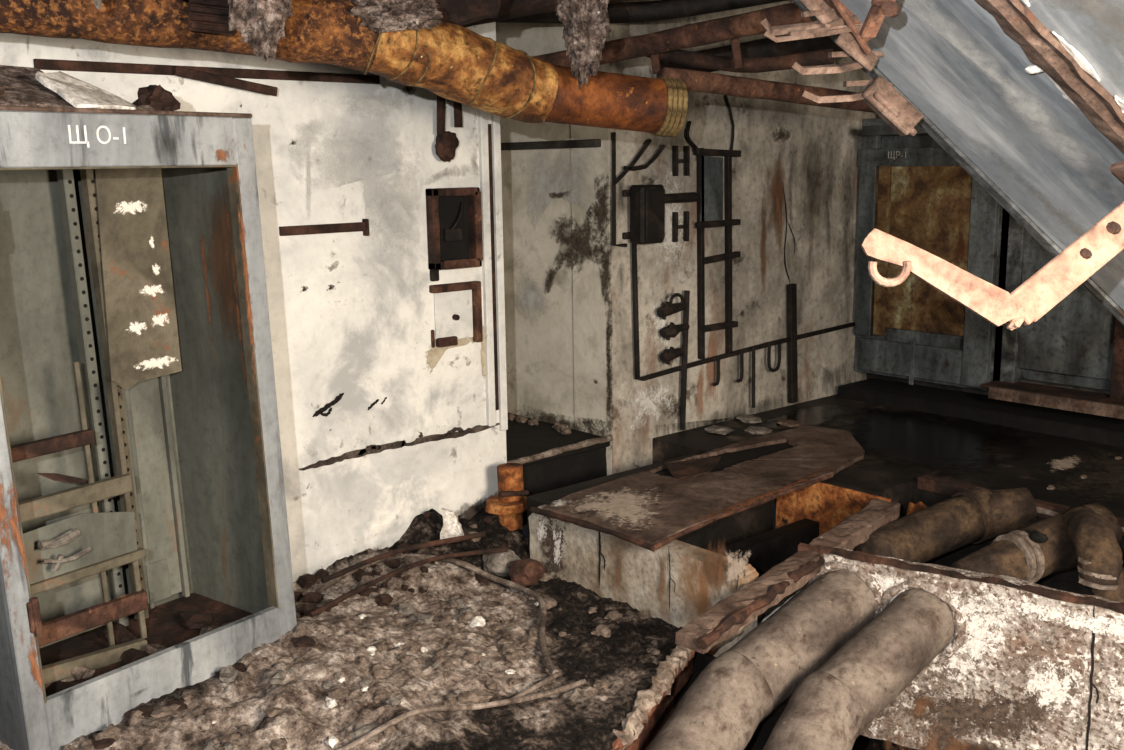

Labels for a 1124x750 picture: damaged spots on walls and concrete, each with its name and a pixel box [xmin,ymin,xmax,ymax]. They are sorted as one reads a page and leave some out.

rust [761,158,784,284]
leakage [522,165,613,450]
crack [299,423,500,471]
leakage [757,586,804,626]
leakage [875,575,908,603]
leakage [932,588,1124,680]
leakage [1026,658,1086,717]
leakage [1107,675,1124,730]